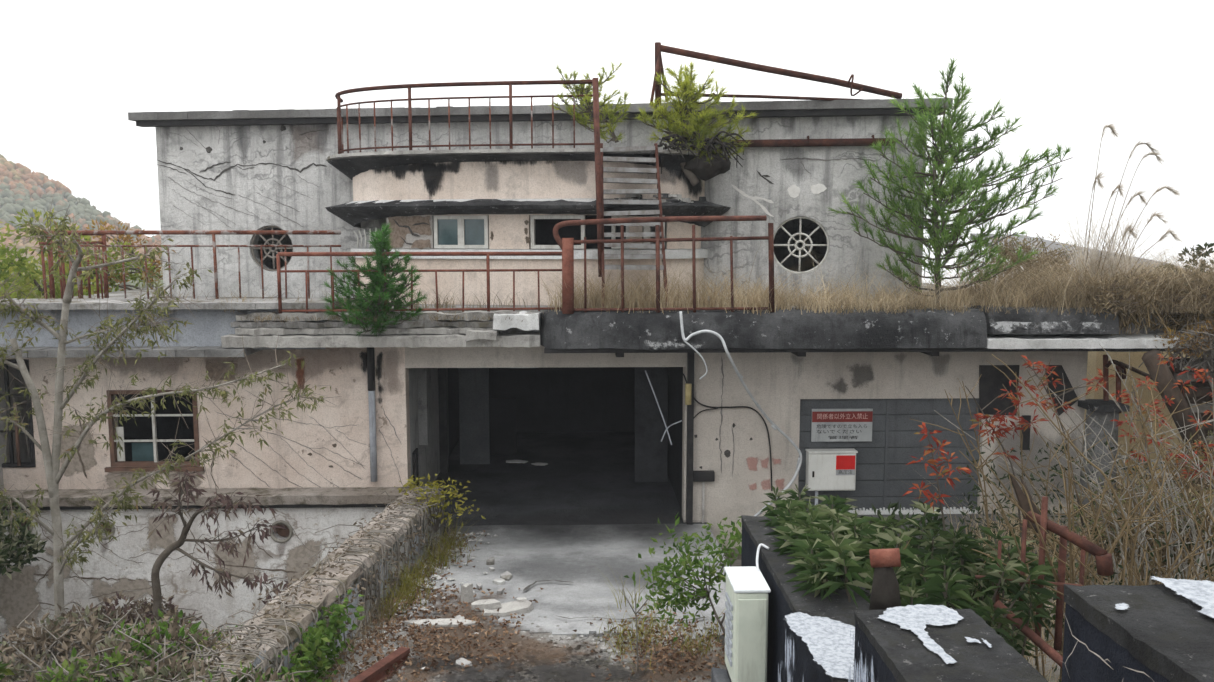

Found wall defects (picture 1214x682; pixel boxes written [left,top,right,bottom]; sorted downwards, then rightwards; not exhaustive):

crack [156,126,327,230]
water stain [392,164,406,179]
water stain [421,163,444,195]
peeling [145,514,178,549]
peeling [0,547,71,630]
peeling [91,578,153,604]
peeling [214,537,261,583]
peeling [284,539,323,589]
peeling [778,612,875,682]
peeling [878,604,963,664]
crack [1061,611,1152,682]